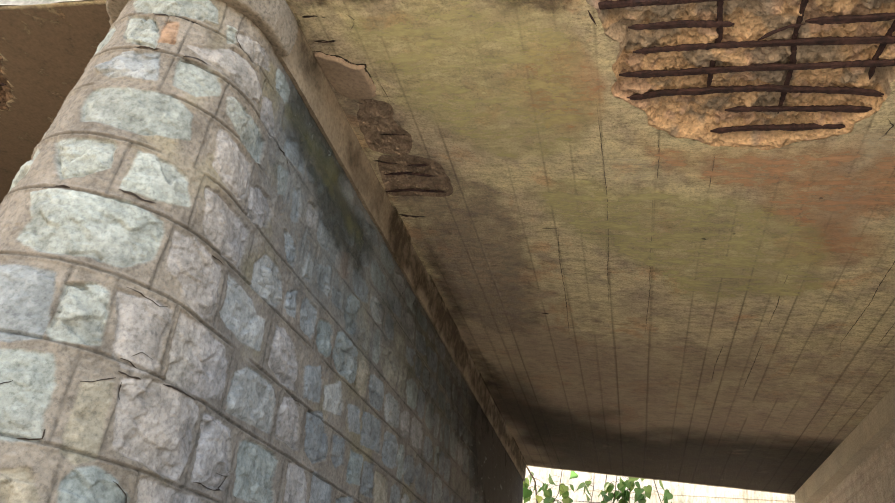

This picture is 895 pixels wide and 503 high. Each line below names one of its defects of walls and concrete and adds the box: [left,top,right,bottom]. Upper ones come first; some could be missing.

spalling [586,0,895,150]
spalling [357,99,453,197]
crack [840,261,895,347]